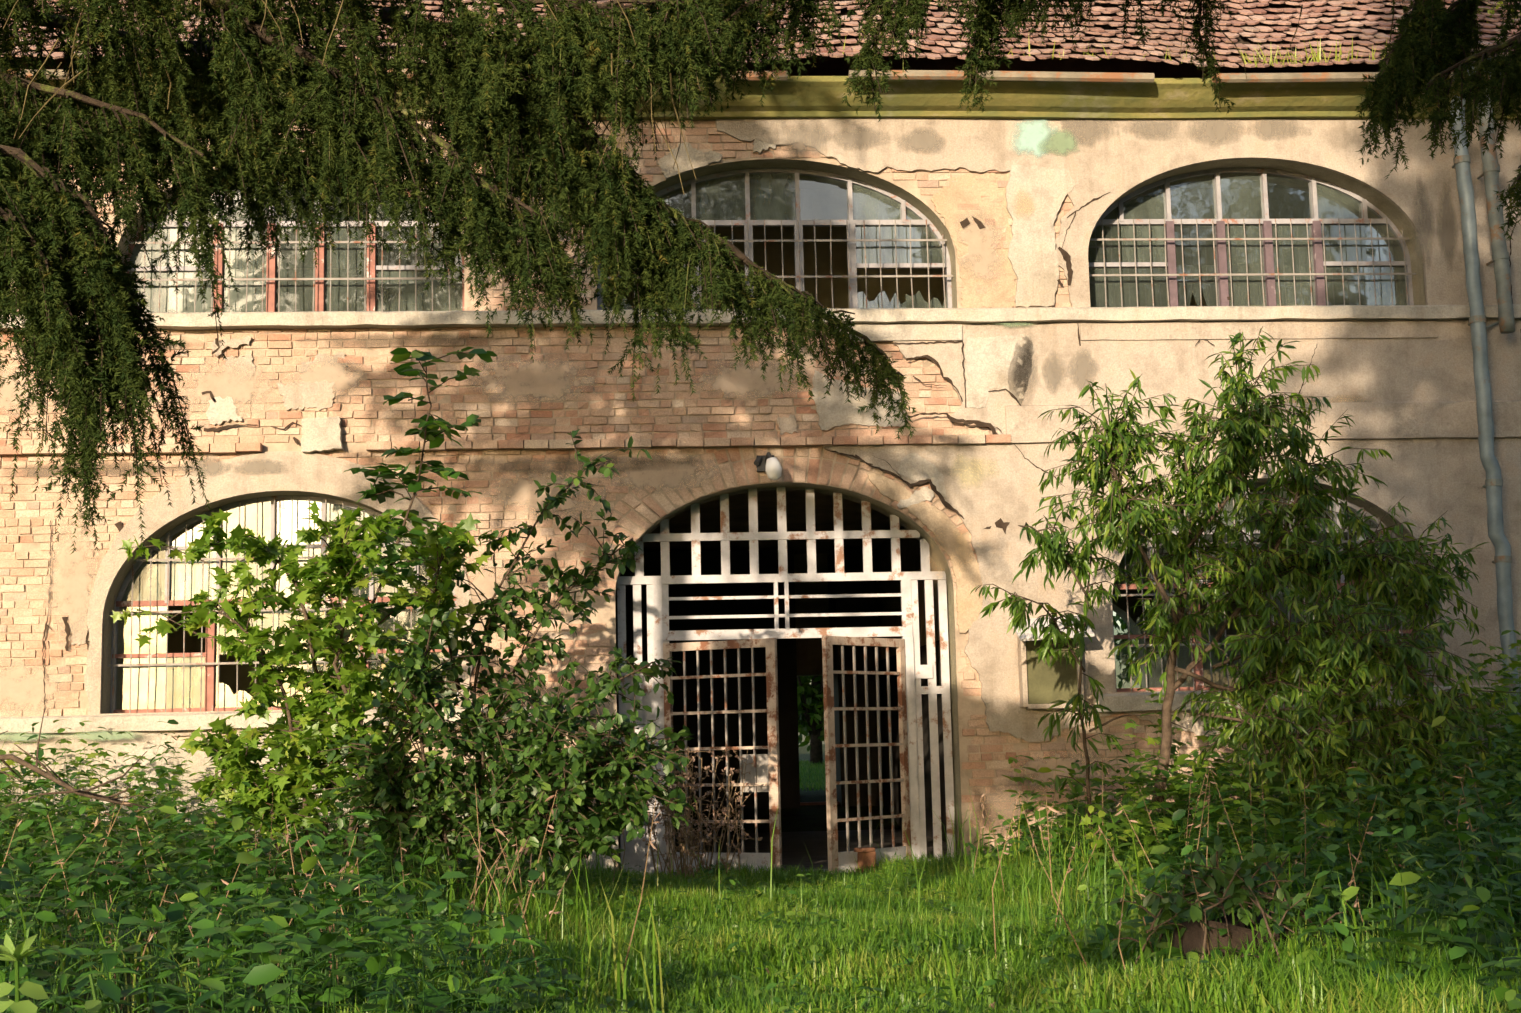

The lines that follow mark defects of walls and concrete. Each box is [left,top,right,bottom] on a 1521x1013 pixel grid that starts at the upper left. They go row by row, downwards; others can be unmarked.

flaking render [59,144,138,236]
peeling [588,120,843,182]
peeling [879,165,1075,308]
water stain [1015,346,1093,390]
peeling [0,182,1034,717]
flaking render [561,724,606,778]
flaking render [961,713,1345,850]